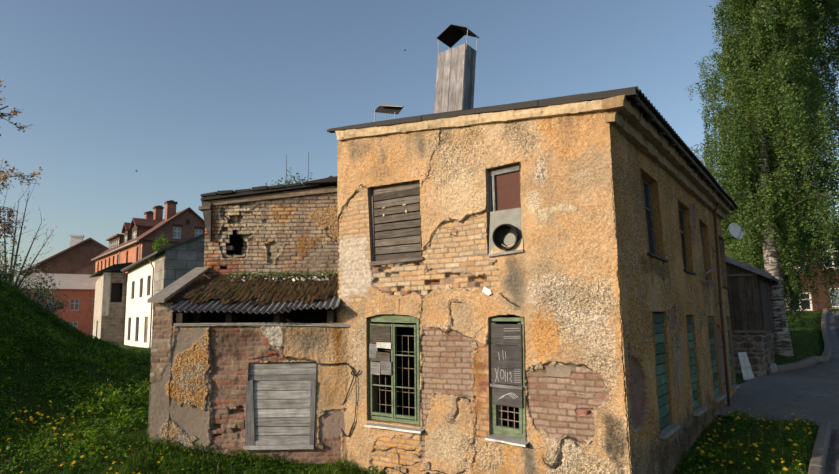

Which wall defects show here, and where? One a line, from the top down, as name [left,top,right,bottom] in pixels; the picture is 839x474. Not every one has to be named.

crack [419,129,448,189]
spalling [333,185,376,306]
crack [420,209,485,251]
spalling [421,212,500,296]
crack [420,297,485,339]
spalling [203,326,347,465]
crack [373,397,477,474]
spalling [371,326,491,474]
crack [543,436,578,469]
crack [529,361,605,385]
spalling [526,359,611,444]
spalling [627,346,645,428]